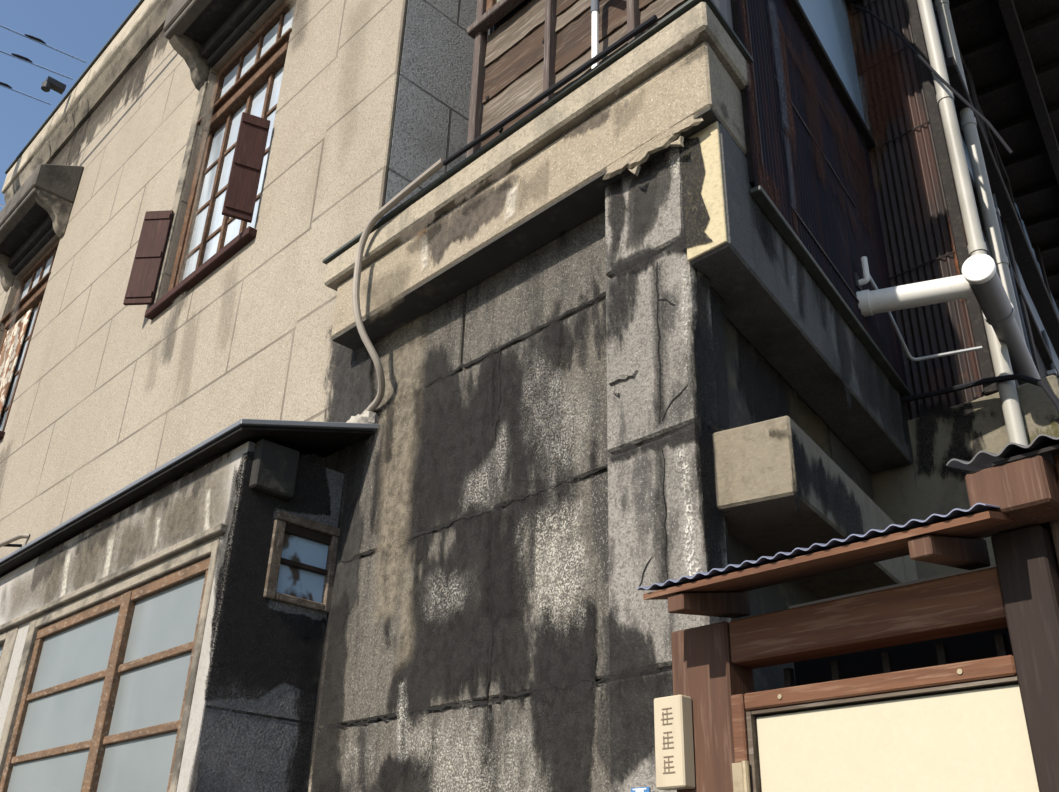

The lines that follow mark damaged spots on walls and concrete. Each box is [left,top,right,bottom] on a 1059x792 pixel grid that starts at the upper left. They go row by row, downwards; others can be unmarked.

damp [49,29,168,166]
spalling [602,115,703,180]
rust [846,5,902,185]
damp [751,197,993,480]
damp [0,137,864,792]
spalling [679,451,699,576]